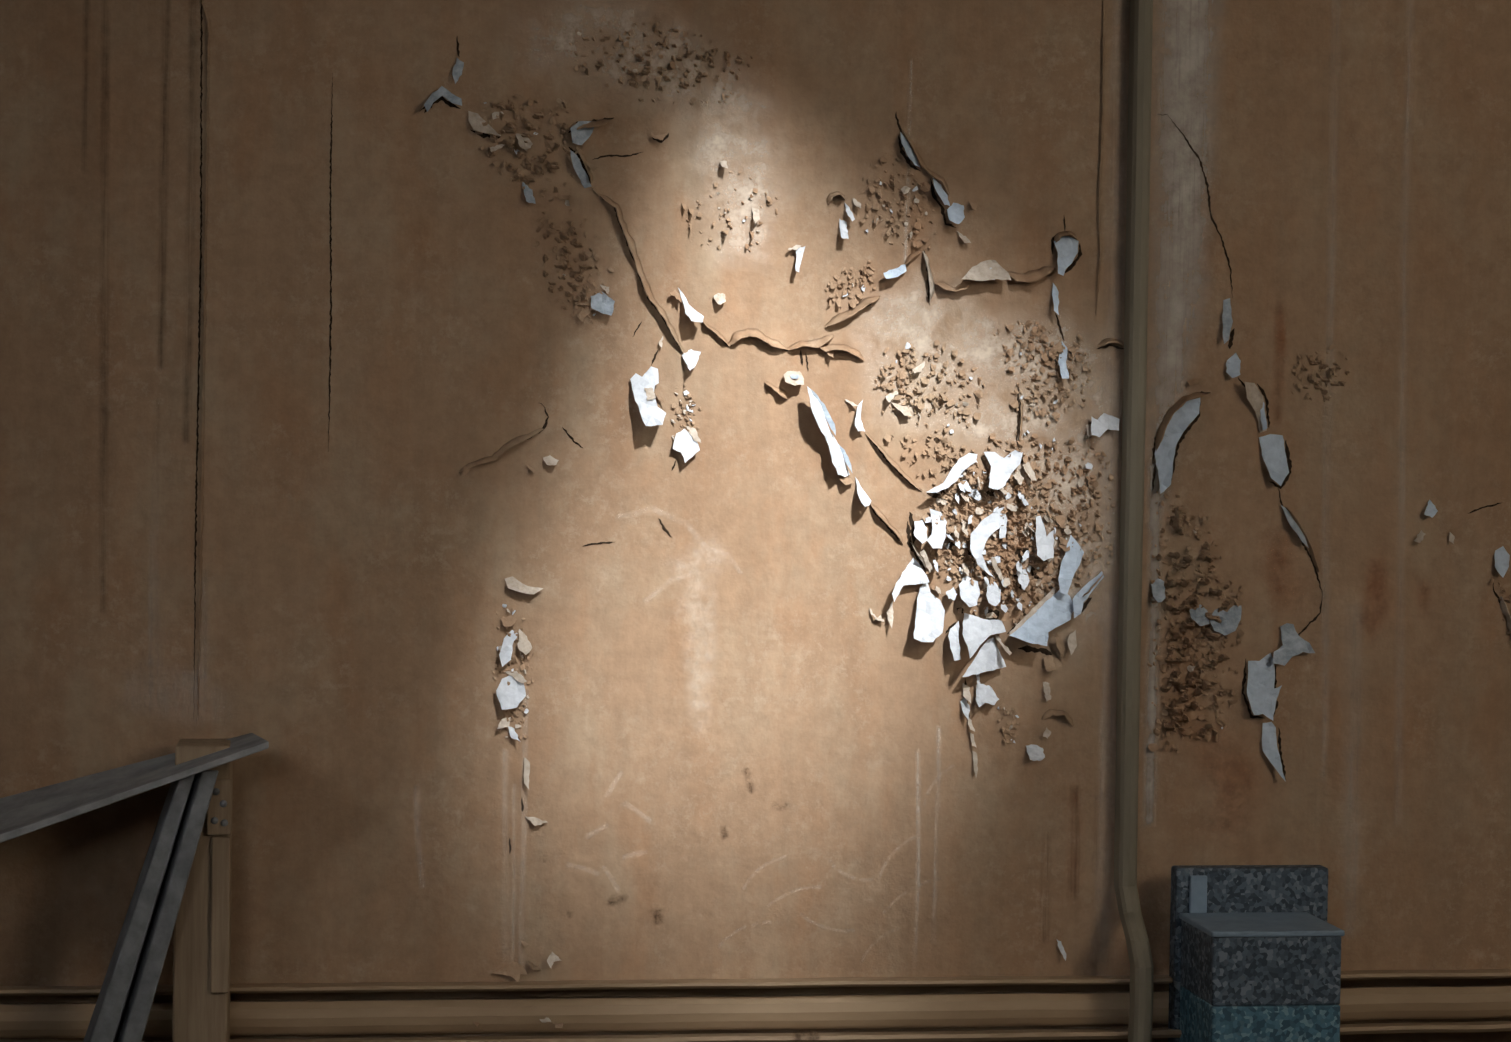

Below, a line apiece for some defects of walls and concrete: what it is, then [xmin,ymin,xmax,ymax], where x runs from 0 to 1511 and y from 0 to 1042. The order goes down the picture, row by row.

crack [592,188,881,370]
peeling [826,191,861,239]
peeling [895,113,978,243]
peeling [883,217,1082,379]
crack [1157,114,1233,298]
peeling [630,350,701,470]
crack [845,399,922,491]
crack [1015,387,1023,448]
peeling [765,371,1119,777]
peeling [491,576,547,826]